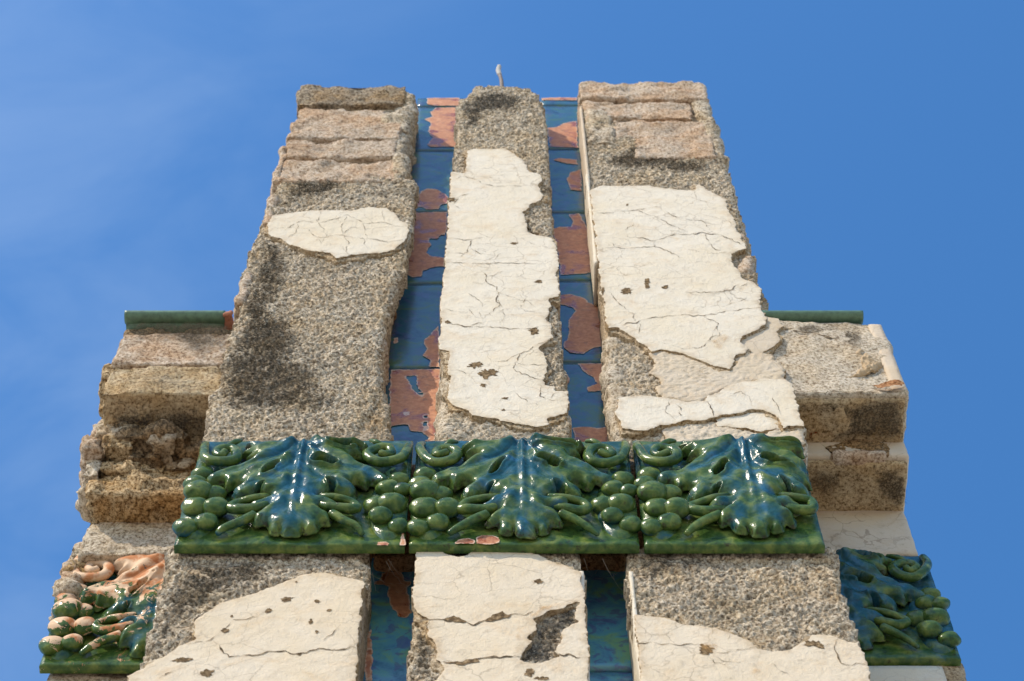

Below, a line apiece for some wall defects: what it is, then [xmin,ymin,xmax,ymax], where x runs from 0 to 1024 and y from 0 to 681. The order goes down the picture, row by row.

crack [281,211,402,250]
spalling [425,85,769,310]
crack [603,190,740,258]
damp [134,244,324,409]
spalling [203,146,419,442]
crack [450,237,553,410]
spalling [529,305,570,391]
crack [610,284,758,349]
crack [197,612,354,657]
crack [420,619,484,629]
crack [443,654,519,662]
spalling [523,554,587,680]